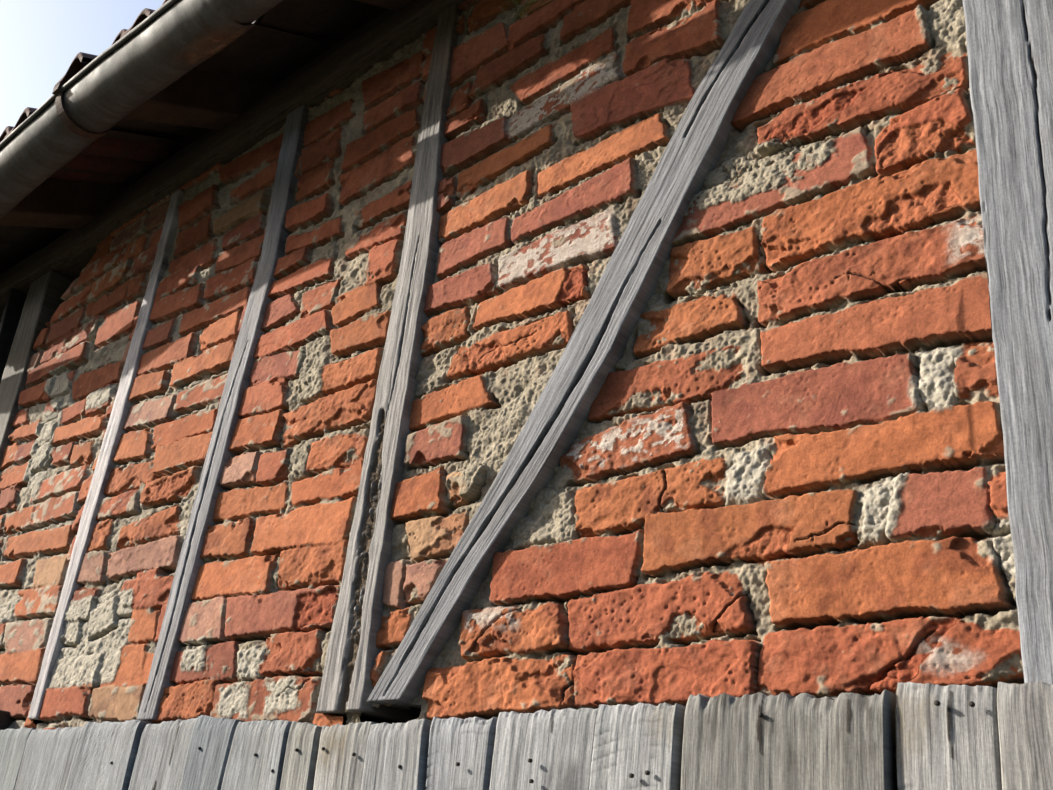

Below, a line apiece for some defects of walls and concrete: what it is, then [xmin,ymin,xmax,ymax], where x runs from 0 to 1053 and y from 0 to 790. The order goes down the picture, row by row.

crack [849,274,911,293]
crack [798,523,855,548]